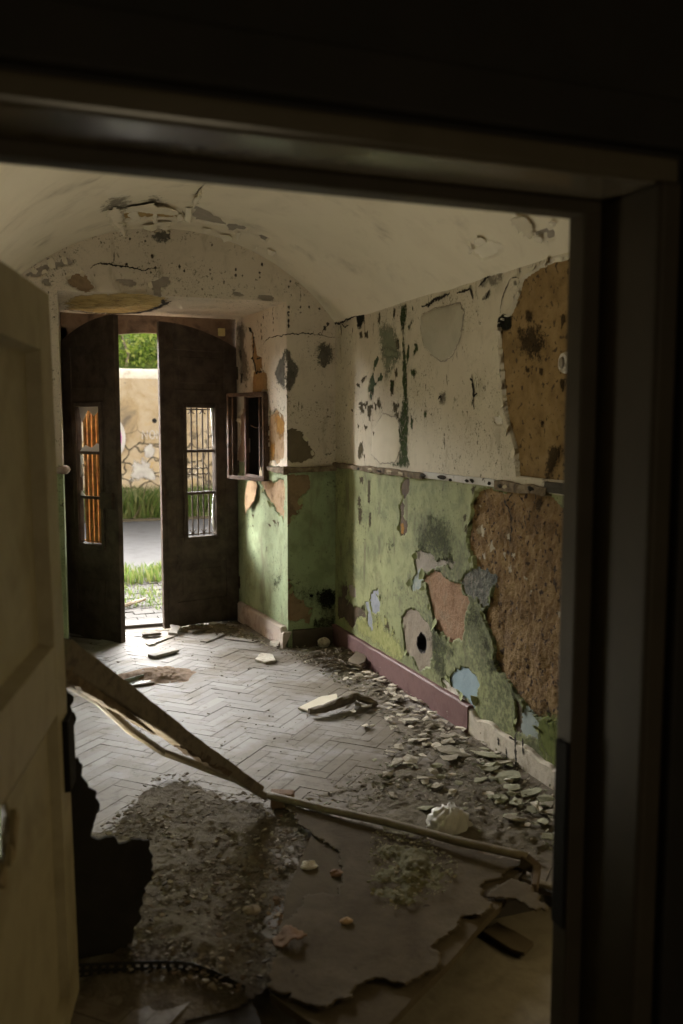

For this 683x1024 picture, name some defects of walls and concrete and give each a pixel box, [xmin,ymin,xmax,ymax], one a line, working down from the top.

peeling [106,203,246,243]
crack [91,262,156,271]
crack [248,316,365,374]
spalling [245,409,315,527]
spalling [338,257,569,739]
water stain [293,587,335,628]
peeling [334,652,554,845]